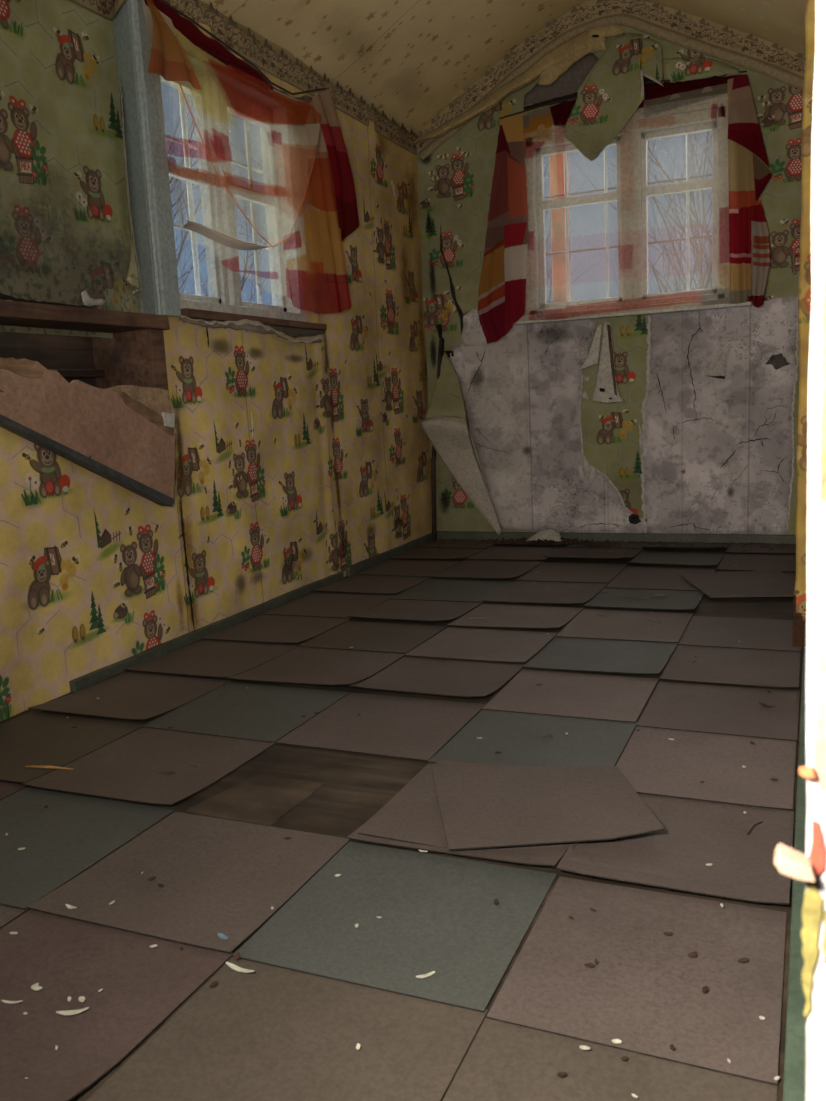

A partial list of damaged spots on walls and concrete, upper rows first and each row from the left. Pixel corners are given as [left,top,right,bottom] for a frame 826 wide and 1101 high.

peeling [523,53,599,106]
spalling [0,329,175,433]
peeling [450,296,799,535]
crack [657,313,713,439]
crack [673,405,785,531]
peeling [813,636,826,790]
peeling [809,819,825,879]